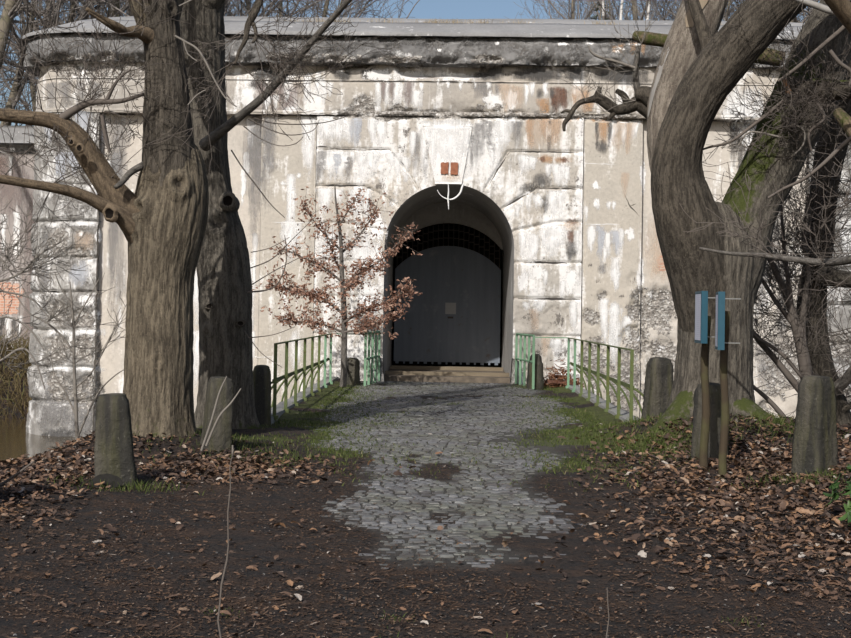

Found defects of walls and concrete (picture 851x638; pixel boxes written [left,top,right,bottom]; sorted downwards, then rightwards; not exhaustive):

damp [381,38,431,46]
rust [527,88,592,137]
rust [595,118,612,151]
damp [240,65,648,319]
damp [599,298,632,367]